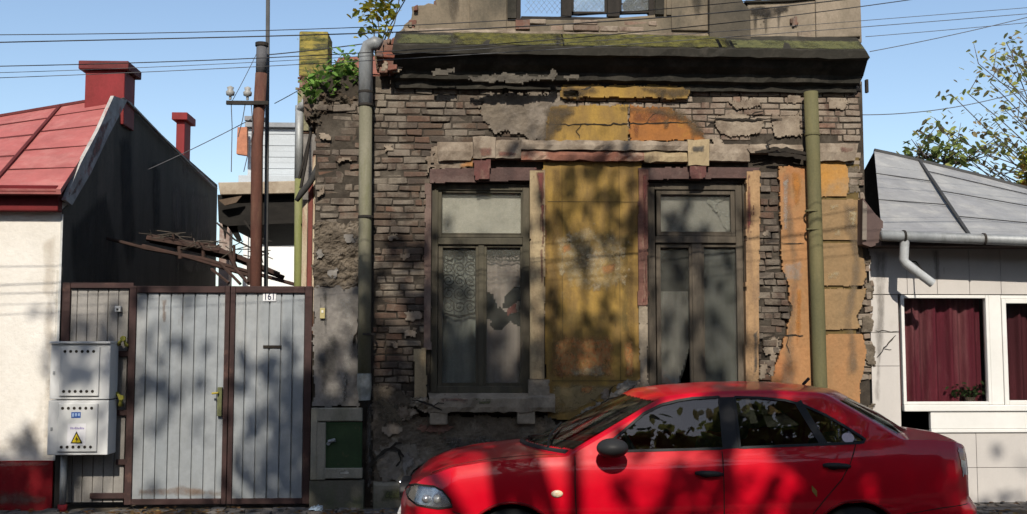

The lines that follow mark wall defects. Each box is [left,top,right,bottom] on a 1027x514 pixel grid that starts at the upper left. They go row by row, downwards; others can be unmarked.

spalling [408,5,419,30]
spalling [311,101,359,290]
spalling [564,92,805,151]
spalling [818,82,865,199]
spalling [372,38,579,482]
peeling [560,223,630,290]
spalling [744,172,790,382]
spalling [857,248,876,380]
crack [574,385,635,421]